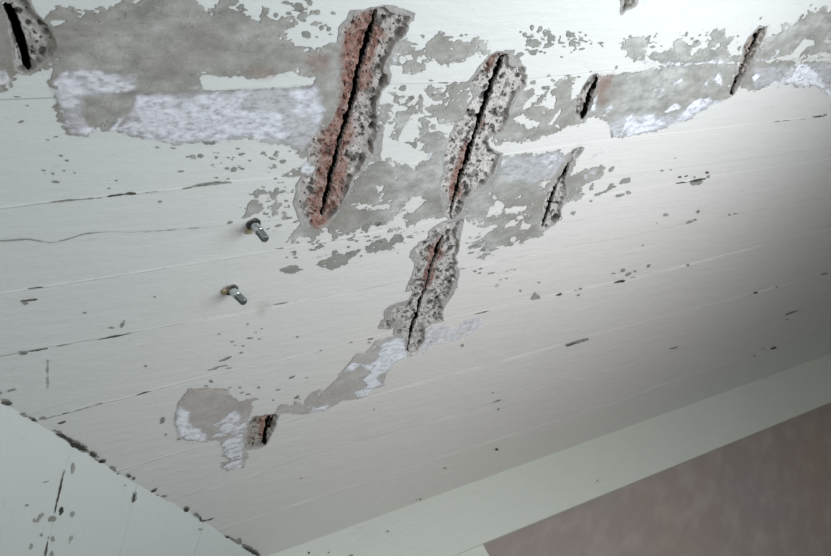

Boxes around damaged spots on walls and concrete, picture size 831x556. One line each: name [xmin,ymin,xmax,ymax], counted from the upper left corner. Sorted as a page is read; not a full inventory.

spalling [620,0,639,15]
peeling [520,25,592,55]
corrosion [309,13,383,230]
peeling [595,177,631,196]
peeling [242,185,294,219]
peeling [364,227,405,253]
peeling [280,251,303,274]
peeling [317,246,362,270]